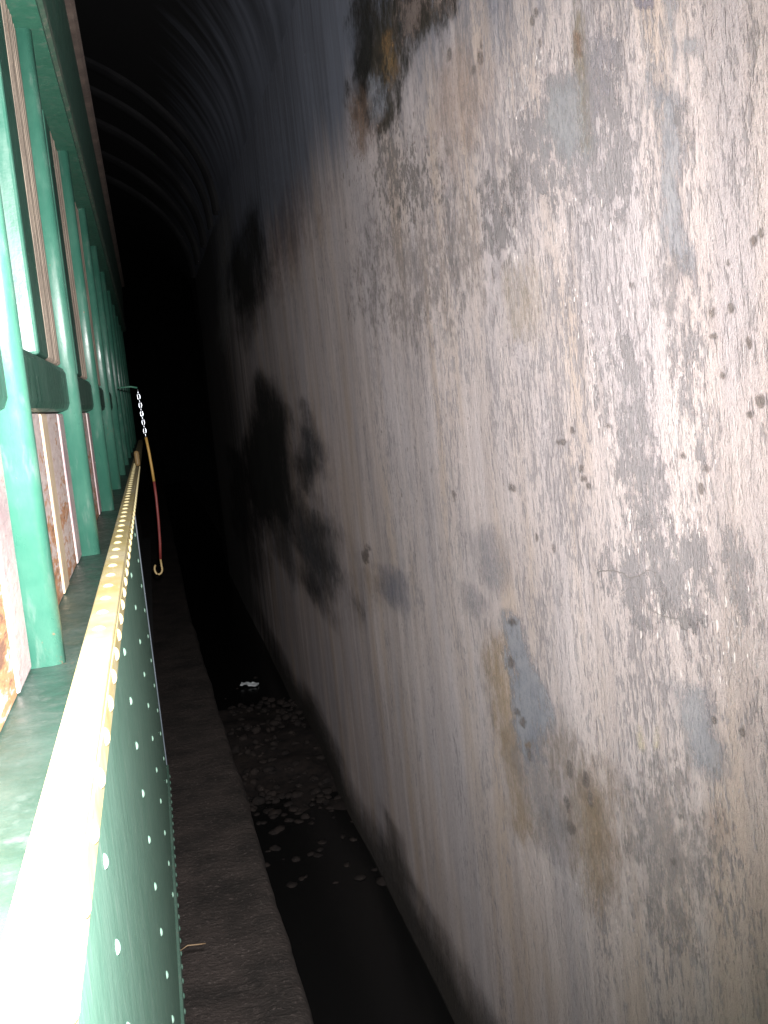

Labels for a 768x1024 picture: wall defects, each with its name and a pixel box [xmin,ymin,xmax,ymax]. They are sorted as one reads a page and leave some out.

leakage [345,0,457,150]
leakage [228,373,336,603]